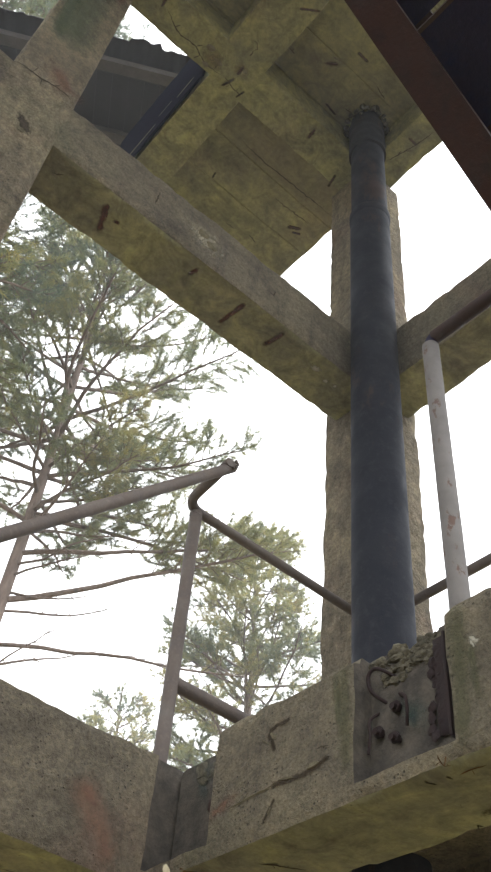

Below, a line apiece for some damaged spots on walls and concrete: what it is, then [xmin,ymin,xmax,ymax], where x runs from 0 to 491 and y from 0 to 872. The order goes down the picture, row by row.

rust [97,205,119,231]
spalling [366,630,456,755]